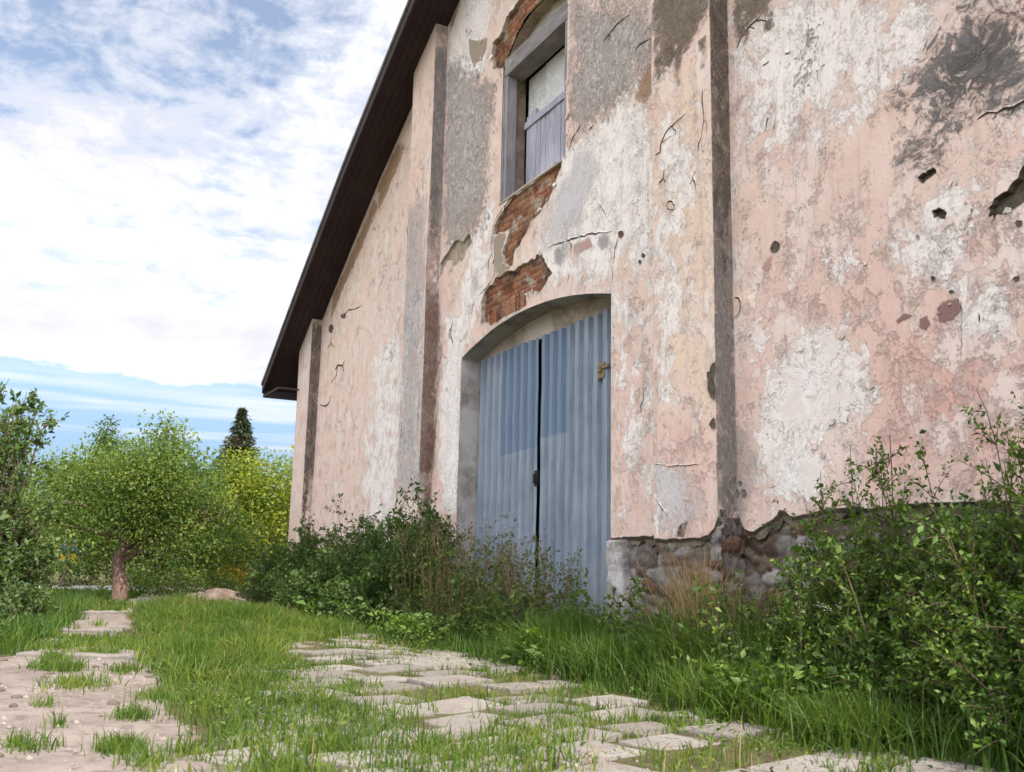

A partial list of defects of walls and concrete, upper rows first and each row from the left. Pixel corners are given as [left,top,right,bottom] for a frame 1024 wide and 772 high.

peeling [439,0,542,277]
crack [655,87,707,212]
spalling [917,167,936,183]
mould [891,0,1024,178]
spalling [931,164,1024,239]
crack [977,99,1024,119]
spalling [479,162,608,326]
crack [547,202,619,285]
peeling [896,299,961,330]
crack [320,336,345,407]
spalling [612,518,726,552]